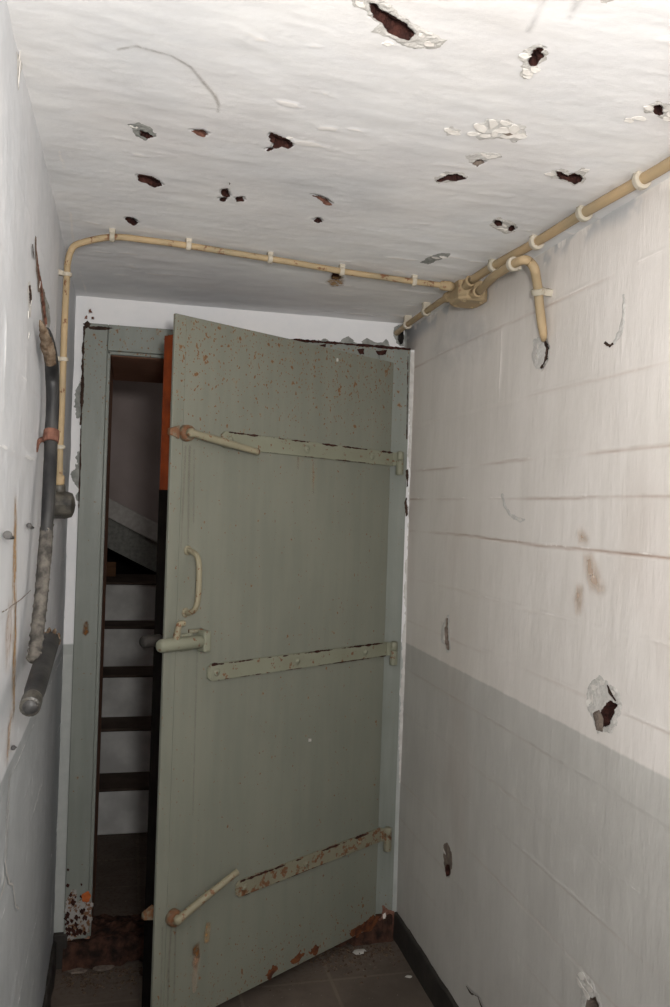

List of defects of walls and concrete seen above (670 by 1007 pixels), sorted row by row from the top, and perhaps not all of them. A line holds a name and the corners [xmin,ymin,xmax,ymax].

spalling [352,0,447,49]
spalling [518,45,549,79]
spalling [624,101,670,123]
spalling [128,122,156,141]
spalling [266,133,294,151]
peeling [444,119,527,143]
spalling [434,171,468,184]
spalling [545,168,590,186]
spalling [585,675,622,734]
spalling [443,843,452,877]
corrosion [64,883,94,941]
corrosion [349,905,395,938]